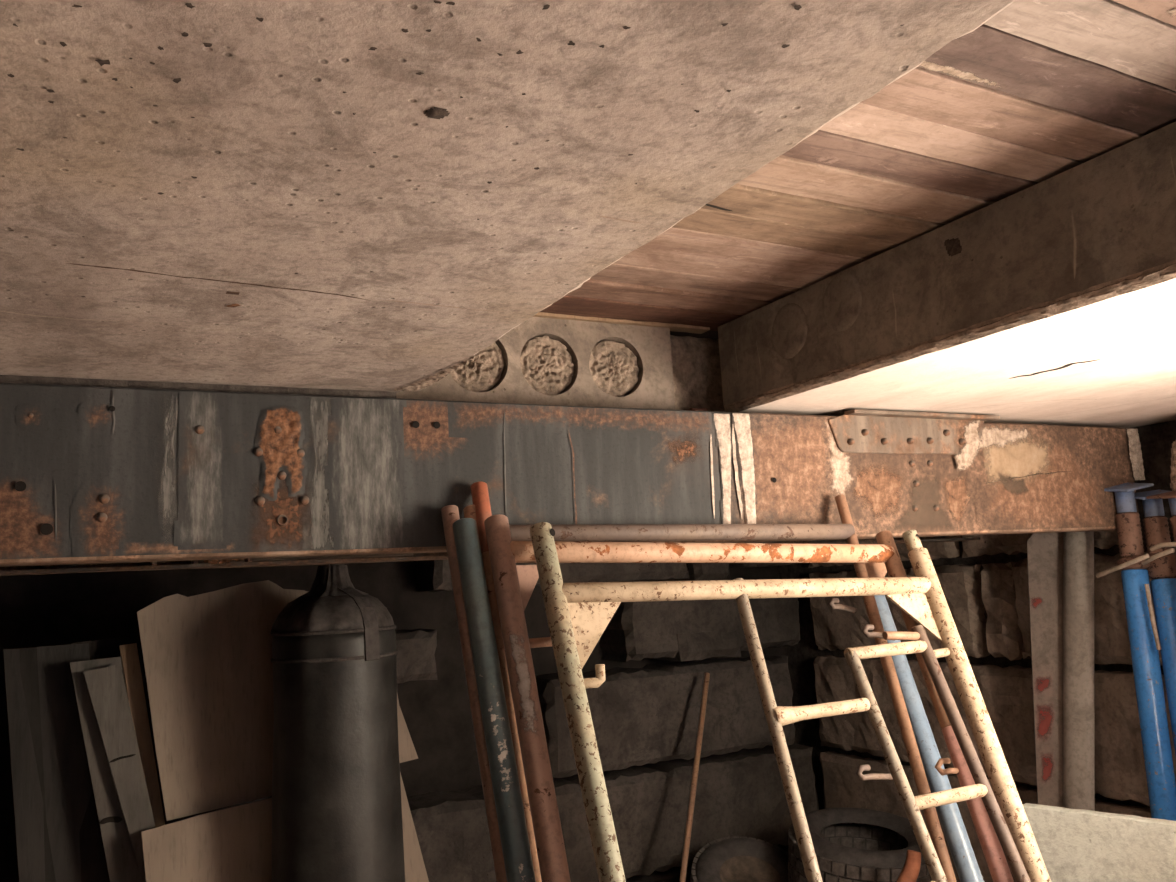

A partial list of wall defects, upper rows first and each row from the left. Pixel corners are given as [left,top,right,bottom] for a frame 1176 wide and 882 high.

crack [67,263,502,312]
crack [919,359,1175,418]
rust [0,472,68,559]
rust [251,487,312,548]
rust [737,414,834,524]
rust [854,465,902,516]
peeling [955,420,1049,481]
rust [944,430,1113,530]